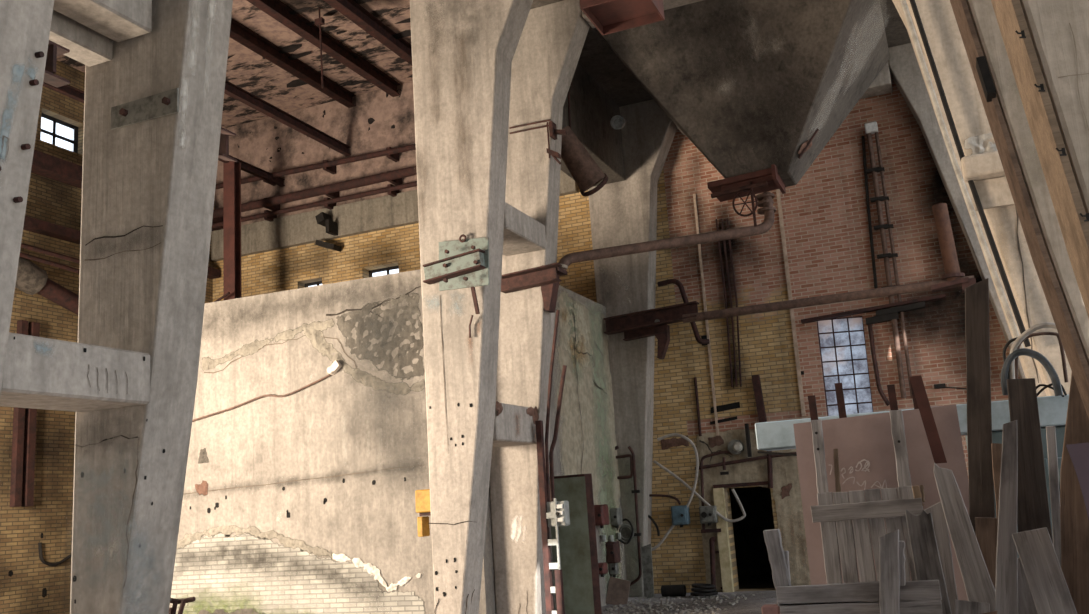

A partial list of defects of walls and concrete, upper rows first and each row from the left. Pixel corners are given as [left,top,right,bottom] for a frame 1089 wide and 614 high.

crack [85,225,163,261]
crack [204,286,448,442]
flaking render [337,293,424,379]
spalling [195,481,227,513]
flaking render [170,525,425,614]